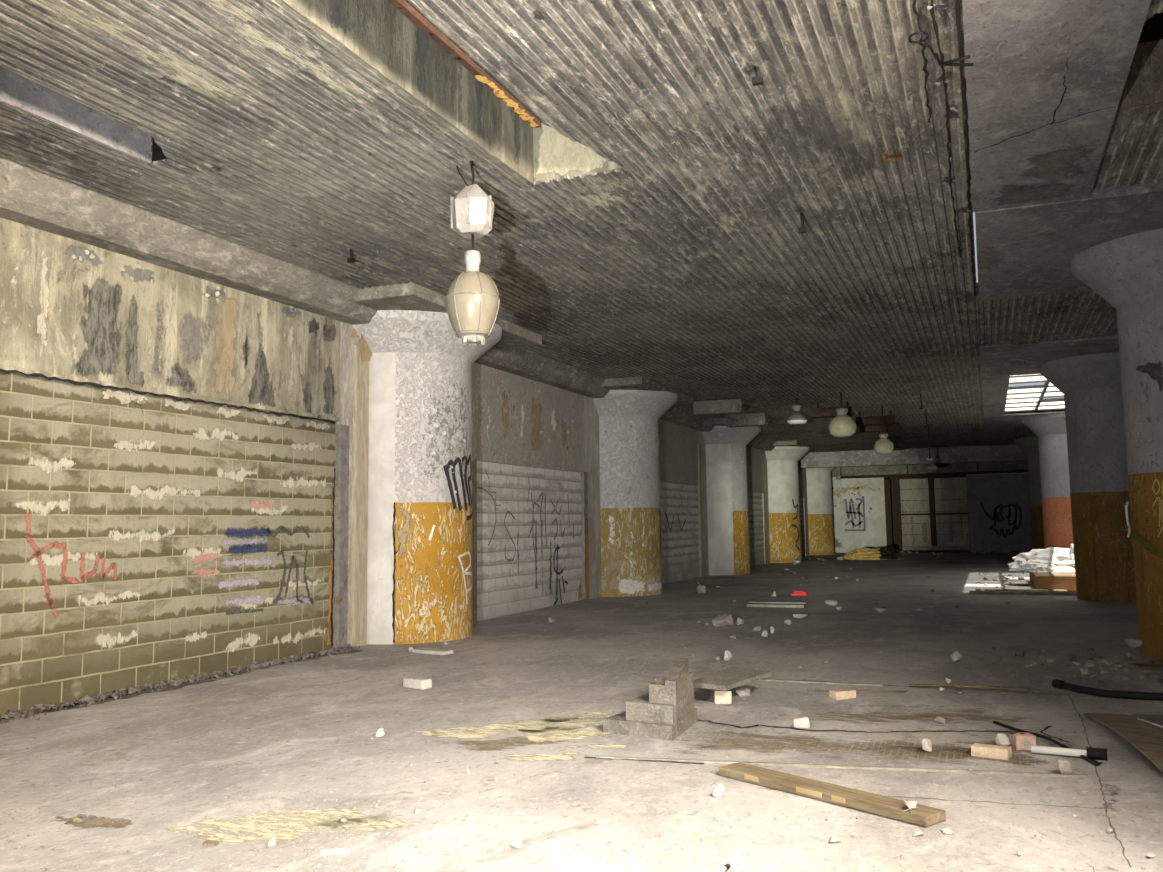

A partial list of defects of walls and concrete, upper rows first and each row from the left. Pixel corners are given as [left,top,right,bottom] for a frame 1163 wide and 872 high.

spalling [536,124,633,192]
water stain [29,253,61,355]
water stain [71,278,212,393]
water stain [241,313,338,415]
water stain [29,457,74,474]
water stain [16,499,70,515]
water stain [78,590,140,606]
peeling [395,509,473,635]
water stain [97,630,137,648]
water stain [226,628,327,652]
crack [584,756,704,764]
crack [697,685,1132,868]